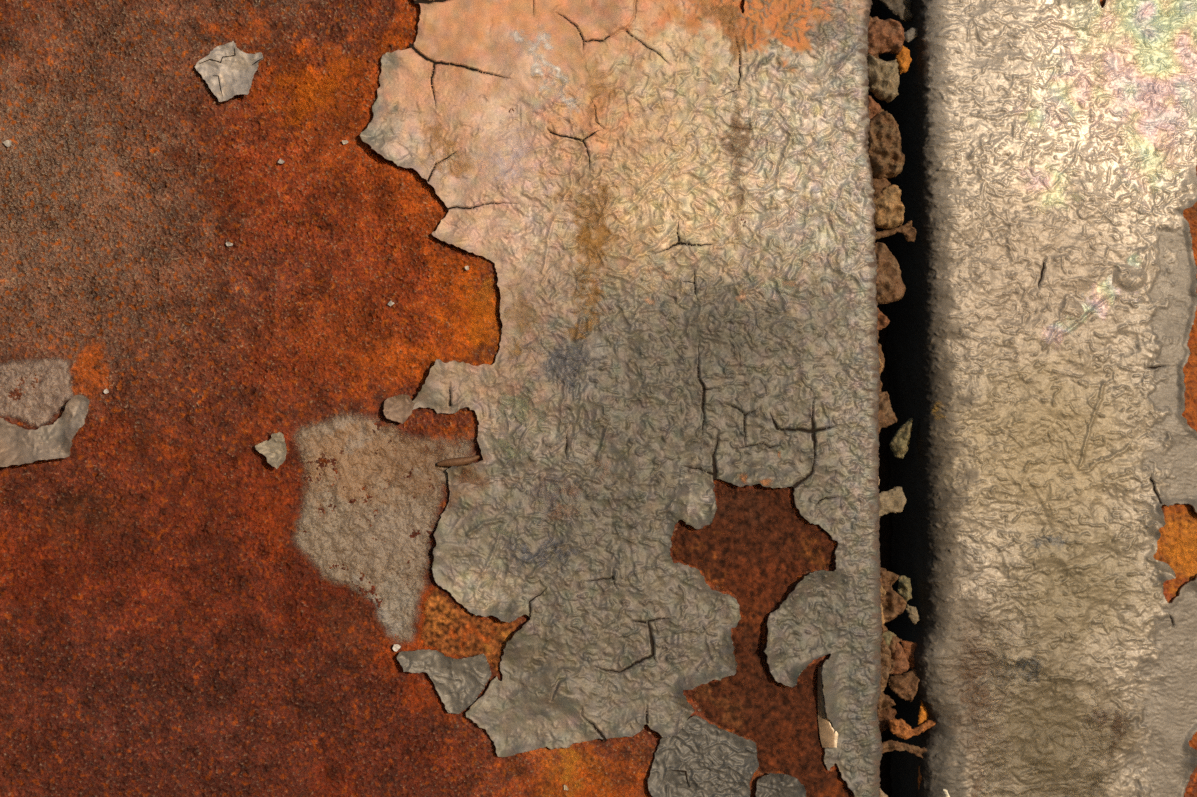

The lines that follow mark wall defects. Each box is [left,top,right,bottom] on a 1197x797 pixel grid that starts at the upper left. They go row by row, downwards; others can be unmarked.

crack [533,0,668,63]
peeling [195,41,263,102]
crack [408,43,506,107]
crack [547,97,602,168]
crack [656,224,712,299]
corrosion [867,0,918,459]
peeling [0,358,90,467]
peeling [255,0,1197,797]
crack [682,346,837,508]
corrosion [878,476,907,516]
crack [597,617,675,673]
corrosion [877,567,936,790]